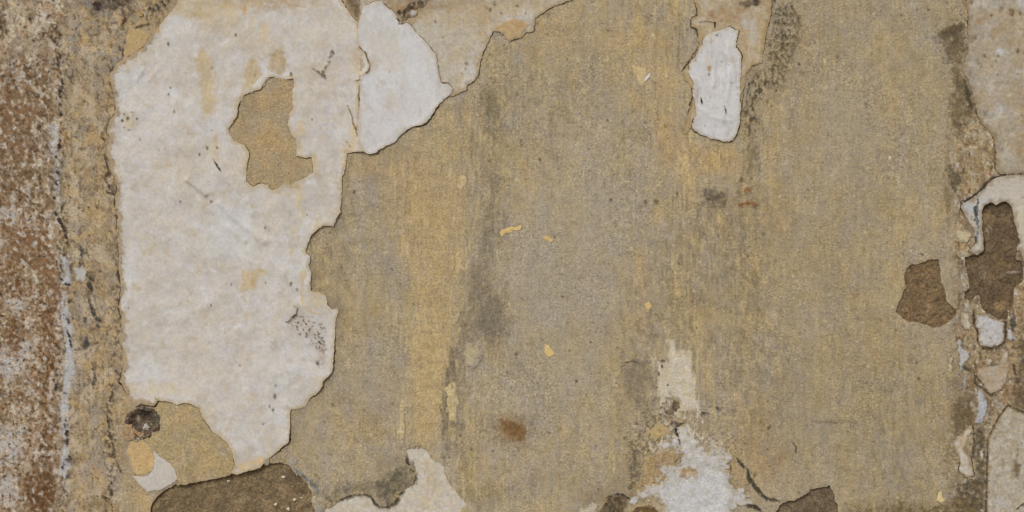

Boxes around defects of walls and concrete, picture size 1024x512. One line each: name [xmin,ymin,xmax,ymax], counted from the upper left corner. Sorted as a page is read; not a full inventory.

peeling [681,0,772,142]
peeling [106,0,573,512]
peeling [896,0,1024,394]
rust [486,408,538,453]
spalling [776,485,838,512]
peeling [951,405,1024,512]